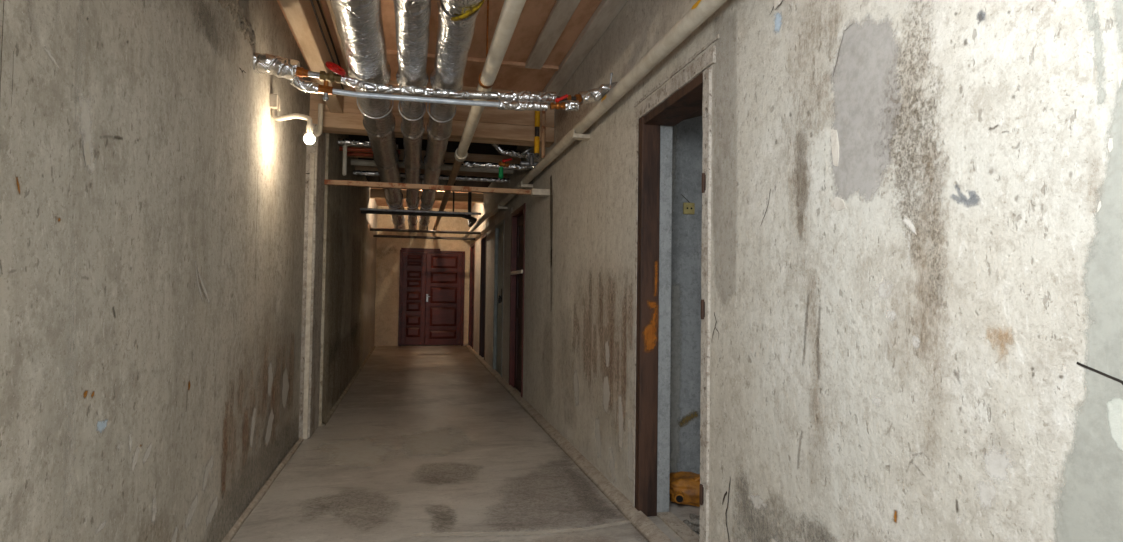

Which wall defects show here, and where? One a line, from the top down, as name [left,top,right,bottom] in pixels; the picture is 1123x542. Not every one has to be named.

rust [222,343,294,495]
peeling [1055,0,1123,542]